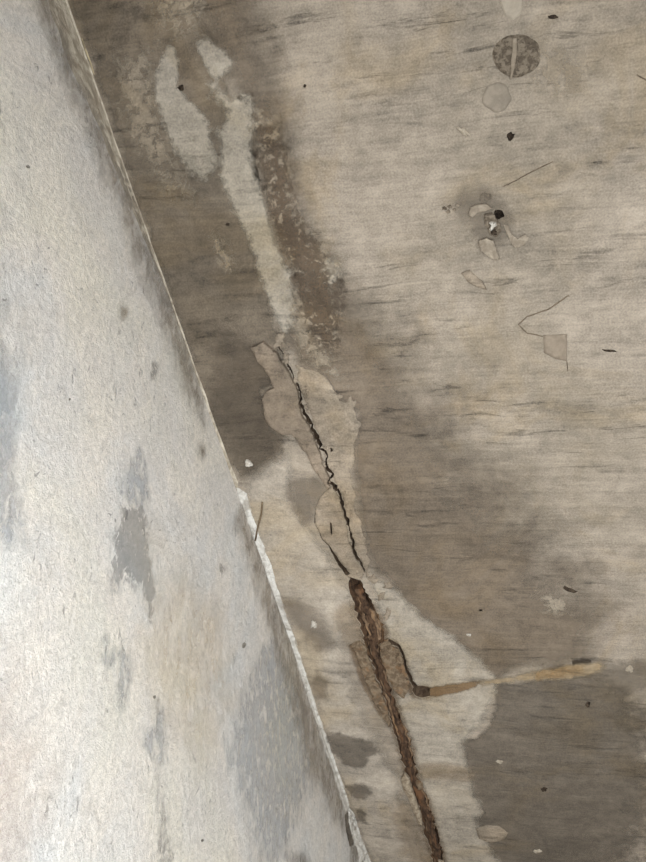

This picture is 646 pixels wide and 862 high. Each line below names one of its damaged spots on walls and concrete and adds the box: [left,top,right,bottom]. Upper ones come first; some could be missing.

leakage [70,0,423,862]
crack [278,347,365,575]
spalling [250,332,445,862]
crack [389,639,430,698]
leakage [216,91,646,862]